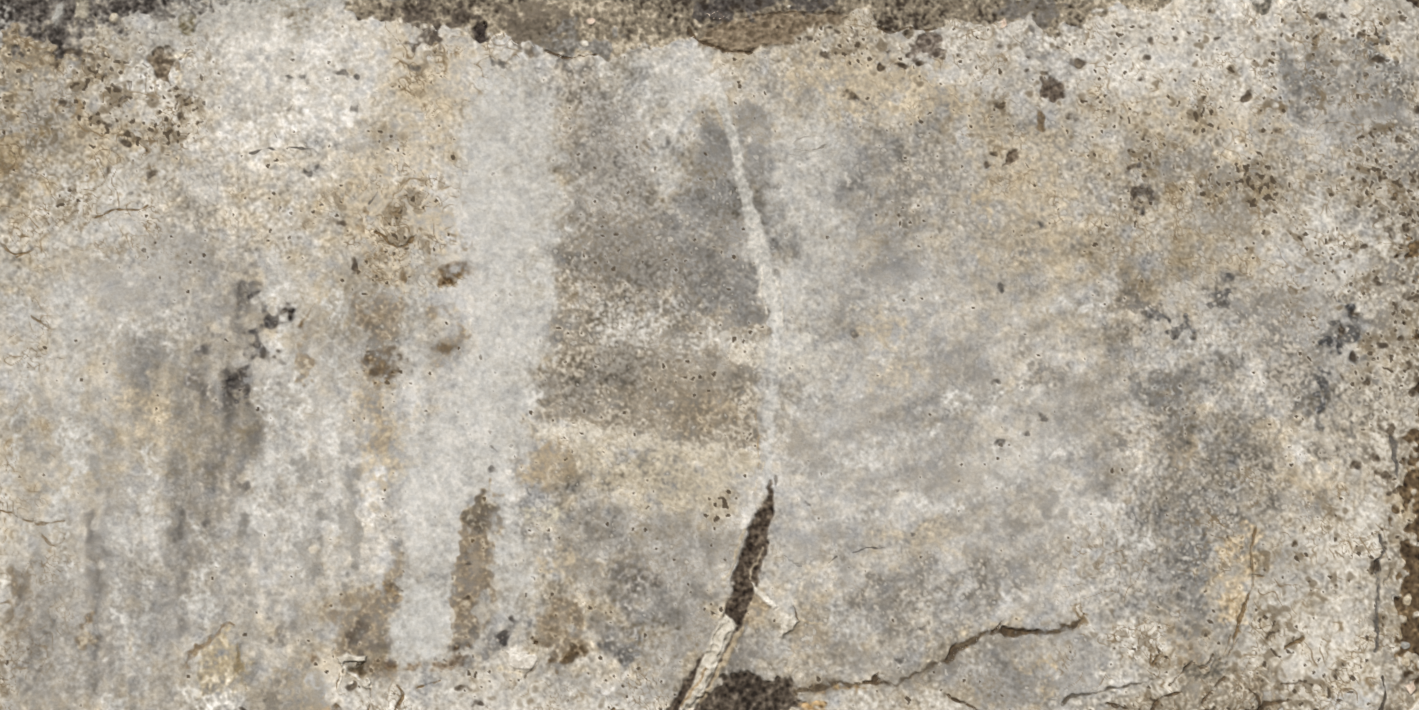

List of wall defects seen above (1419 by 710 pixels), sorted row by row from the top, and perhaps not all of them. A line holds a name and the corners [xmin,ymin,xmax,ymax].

flaking render [0,0,157,70]
flaking render [340,0,1213,134]
flaking render [1235,0,1278,58]
flaking render [334,206,418,285]
water stain [0,0,417,710]
water stain [305,51,679,692]
flaking render [1336,168,1419,710]
flaking render [331,643,489,710]
spalling [664,473,824,710]
crack [784,546,886,568]
crack [792,603,1085,710]
crack [1060,525,1306,710]